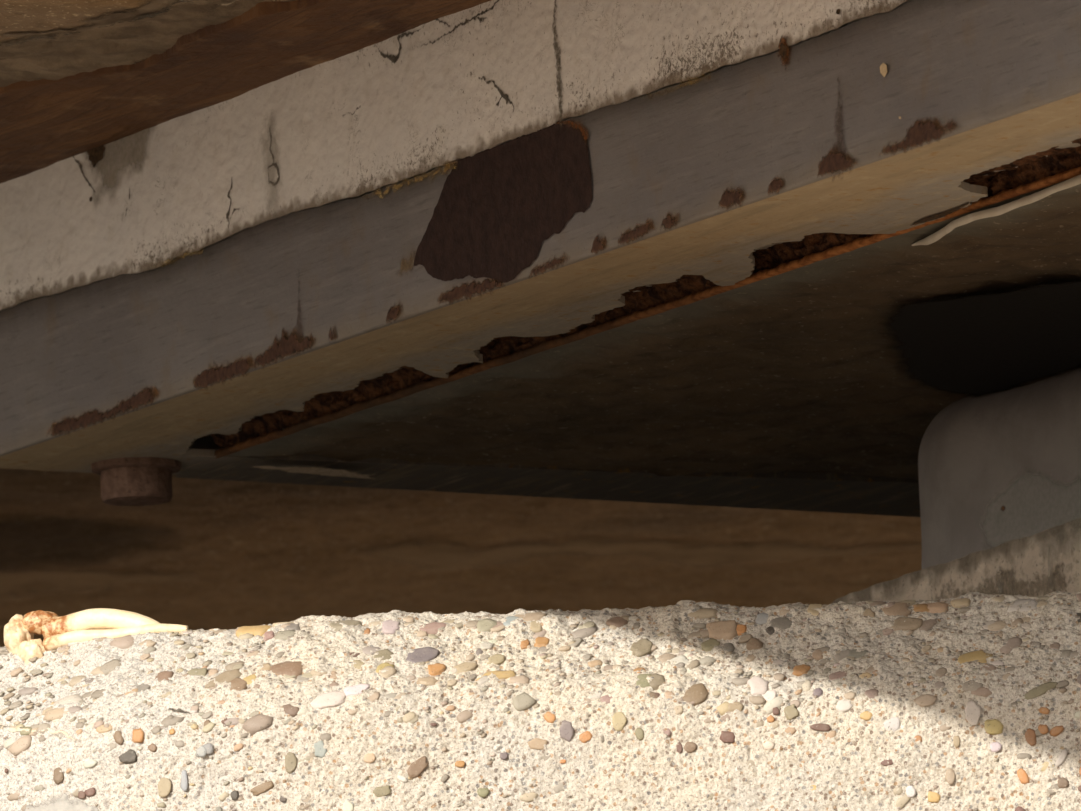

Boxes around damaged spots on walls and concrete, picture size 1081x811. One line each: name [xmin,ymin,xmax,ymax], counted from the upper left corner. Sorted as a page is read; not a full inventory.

crack [379,0,499,63]
crack [268,132,280,186]
crack [478,76,514,111]
corrosion [818,93,855,175]
corrosion [882,119,956,153]
peeling [414,119,592,283]
corrosion [193,304,316,388]
corrosion [214,162,1081,459]